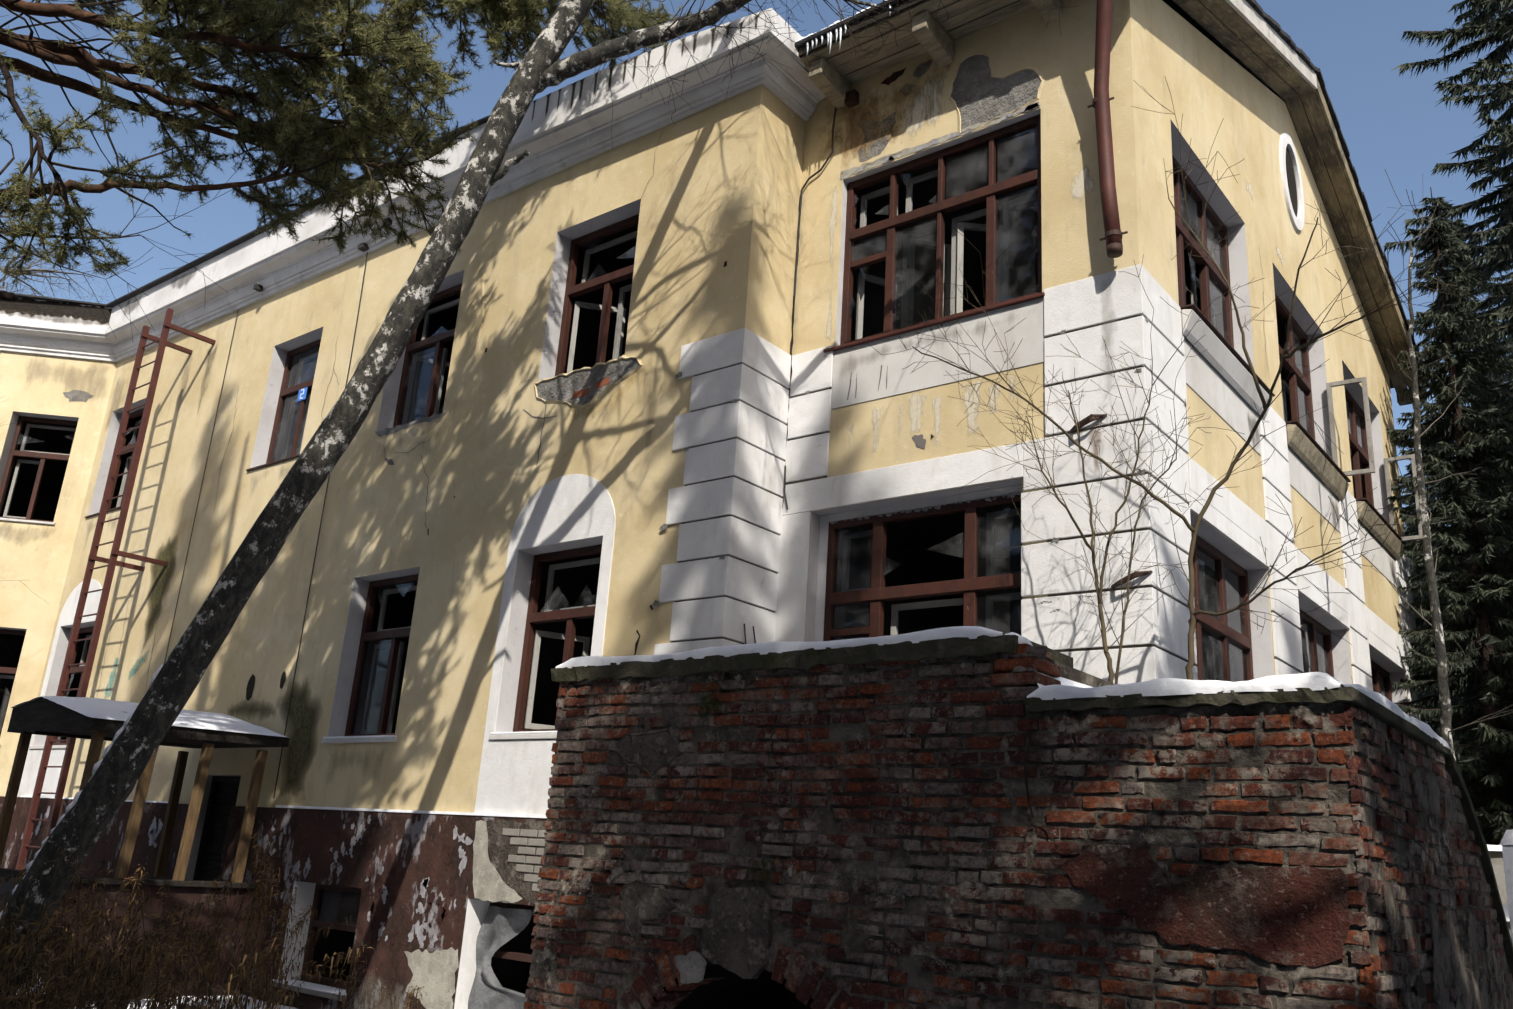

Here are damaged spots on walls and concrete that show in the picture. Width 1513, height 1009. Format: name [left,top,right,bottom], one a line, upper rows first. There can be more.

spalling [840,51,1045,180]
spalling [534,355,643,408]
peeling [20,798,54,845]
peeling [268,819,287,862]
peeling [278,854,311,900]
flaking render [330,815,546,1009]